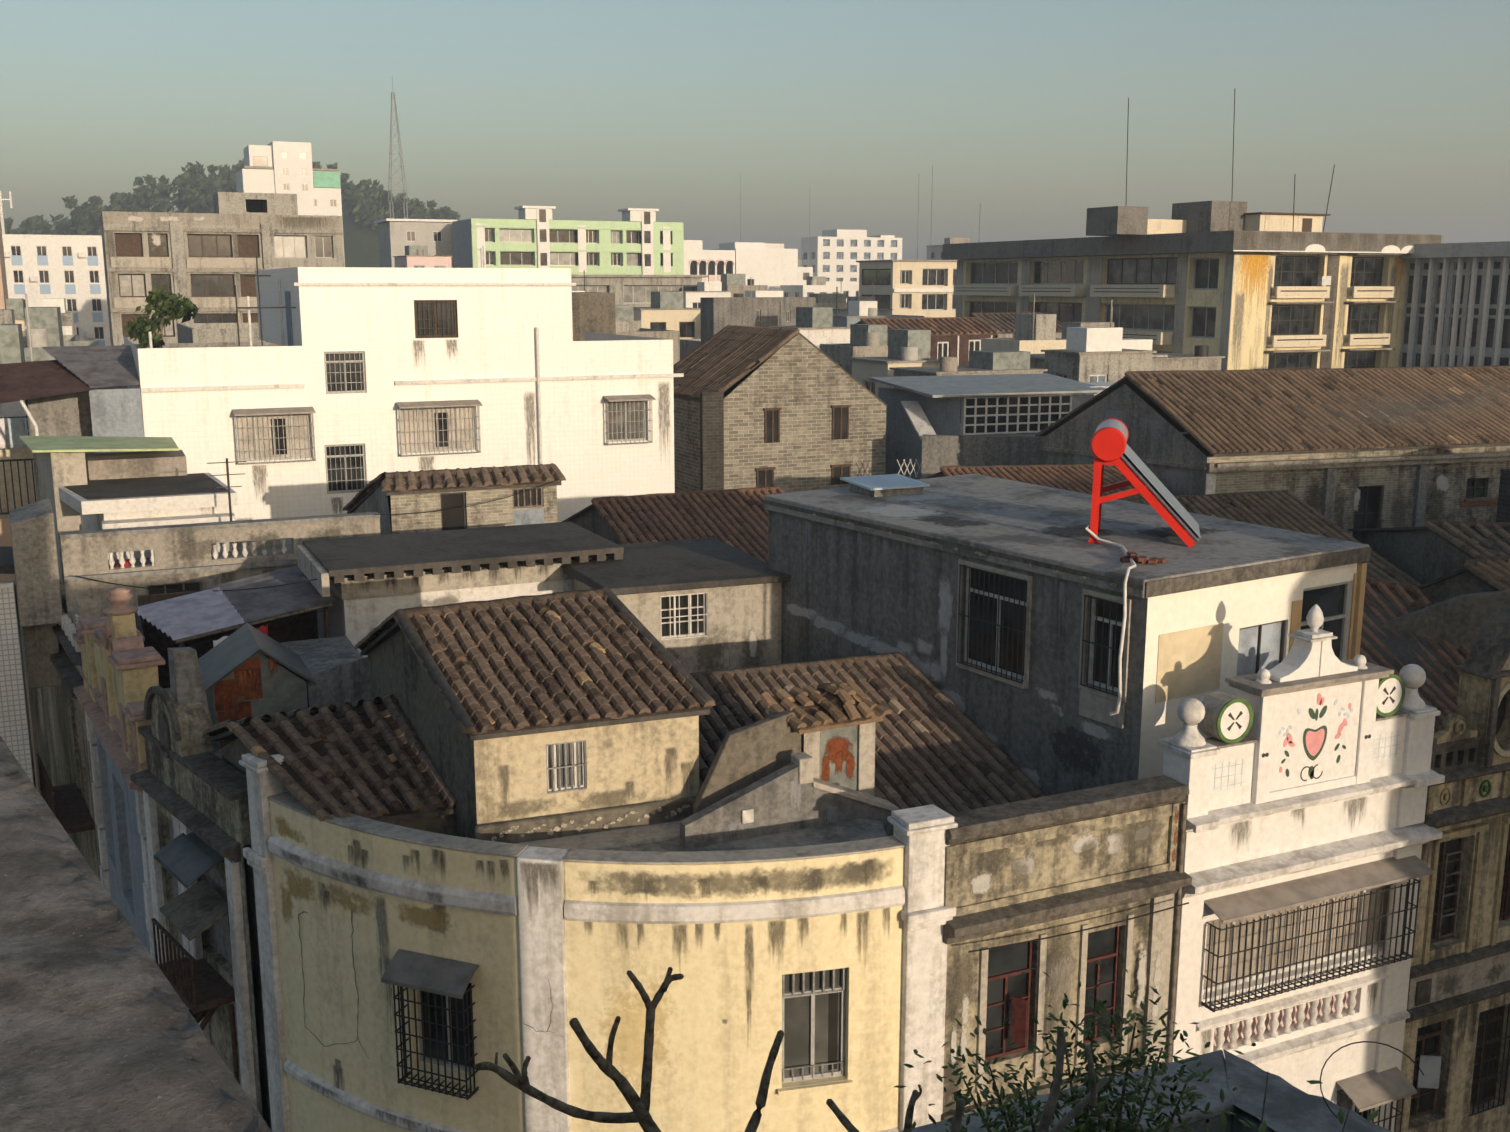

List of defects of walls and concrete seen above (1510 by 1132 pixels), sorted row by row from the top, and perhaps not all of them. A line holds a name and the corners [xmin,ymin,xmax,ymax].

water stain [1233,232,1442,367]
crack [298,909,369,1059]
water stain [674,923,720,947]
water stain [589,860,883,895]
water stain [745,919,808,1020]
water stain [843,909,890,945]